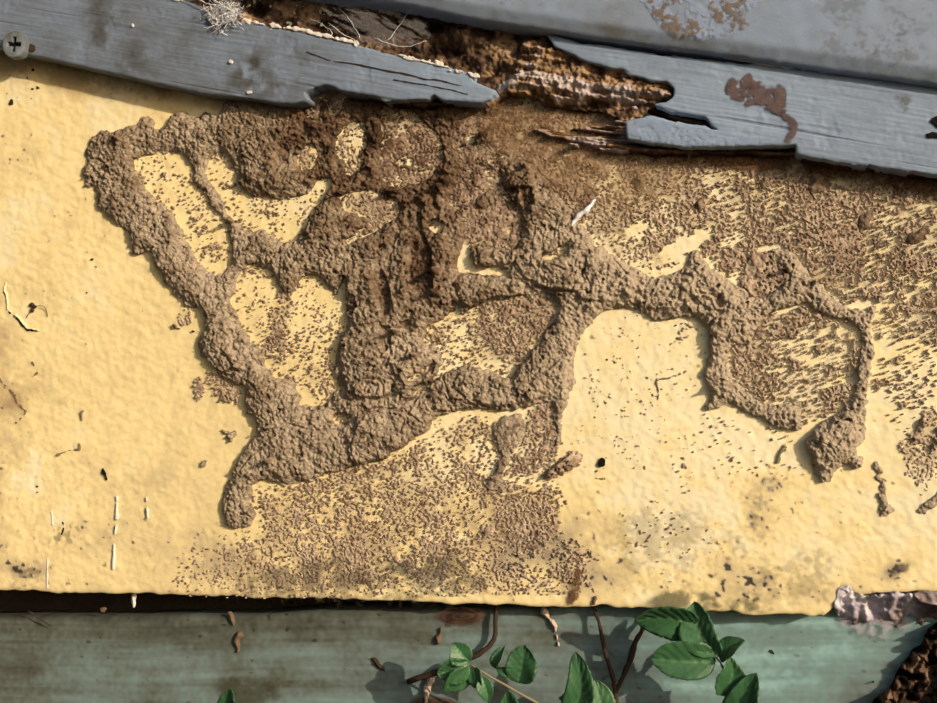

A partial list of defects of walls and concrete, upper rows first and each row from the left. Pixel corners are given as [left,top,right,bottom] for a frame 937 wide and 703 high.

peeling [641,0,760,38]
crack [306,51,468,95]
crack [3,282,40,331]
spalling [833,585,937,630]